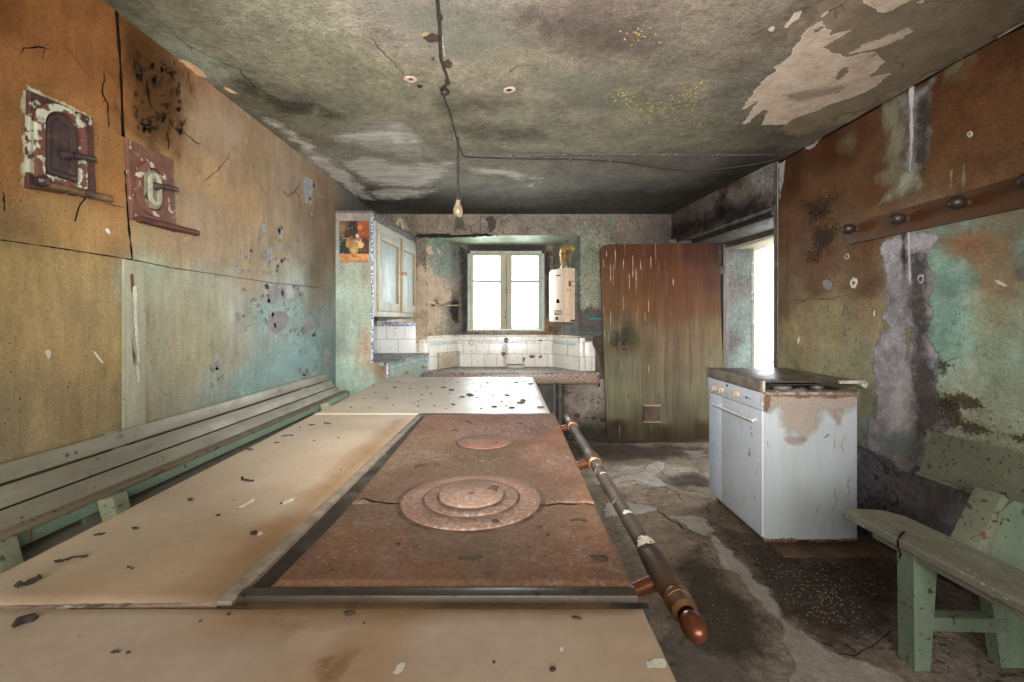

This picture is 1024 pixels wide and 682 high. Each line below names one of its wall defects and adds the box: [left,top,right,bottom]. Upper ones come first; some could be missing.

crack [20,43,110,127]
water stain [128,31,185,149]
crack [204,155,300,202]
water stain [264,99,453,201]
water stain [673,180,770,239]
flaking render [778,160,786,199]
peeling [742,0,1024,149]
water stain [882,57,966,201]
peeling [234,221,332,379]
flaking render [416,216,500,335]
water stain [861,231,1024,489]
peeling [612,461,667,487]